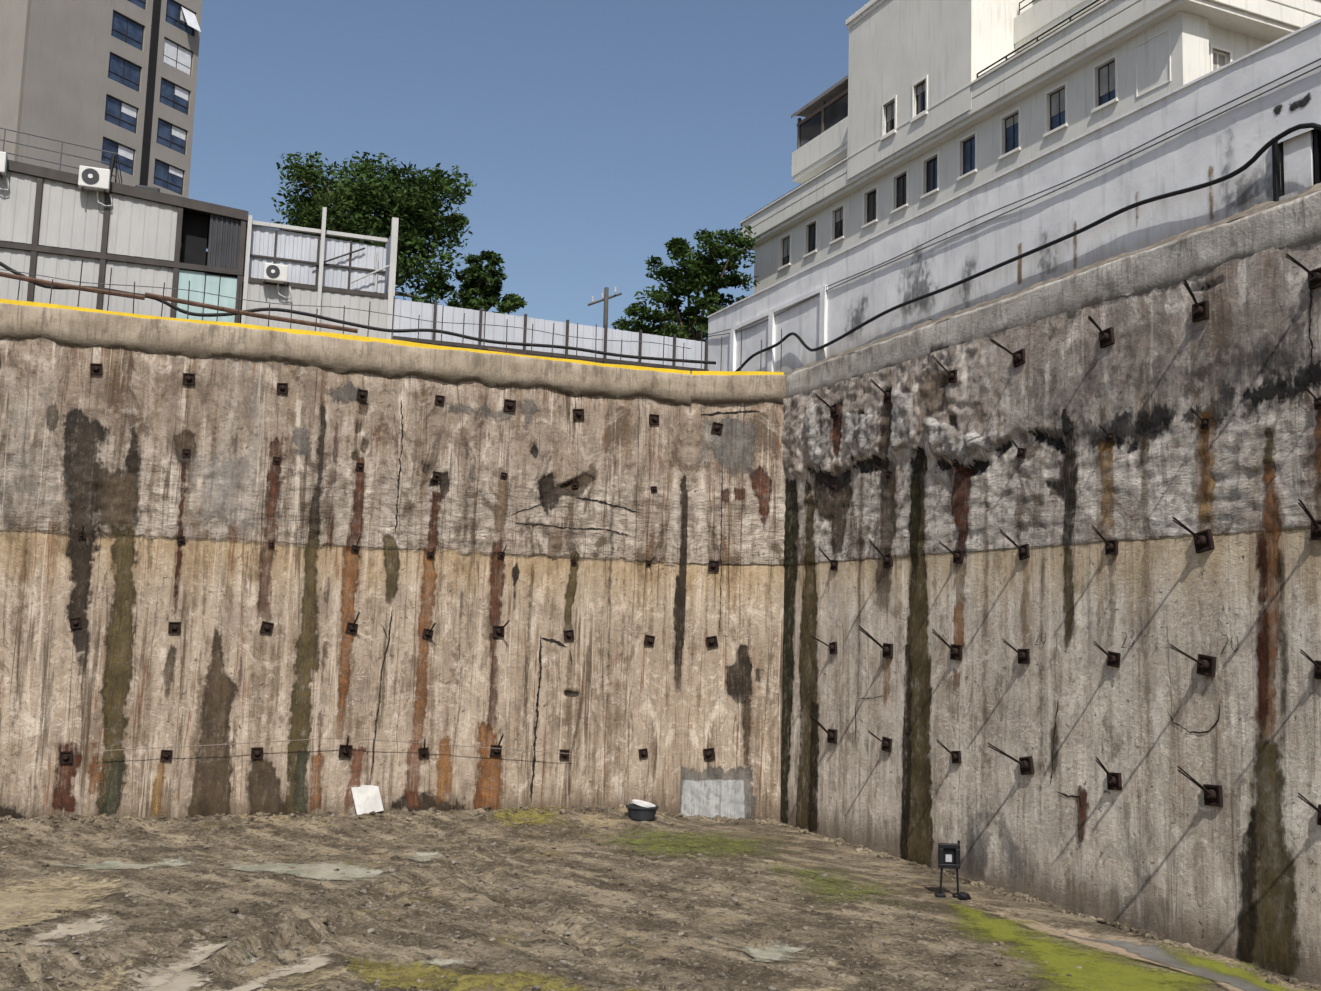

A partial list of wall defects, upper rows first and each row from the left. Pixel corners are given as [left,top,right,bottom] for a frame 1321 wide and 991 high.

water stain [46,404,141,815]
water stain [188,404,337,817]
corrosion [405,491,441,807]
corrosion [437,738,453,802]
corrosion [473,468,507,810]
corrosion [721,466,772,524]
water stain [780,465,855,832]
water stain [876,457,935,867]
water stain [1056,362,1321,647]
corrosion [1237,427,1301,976]